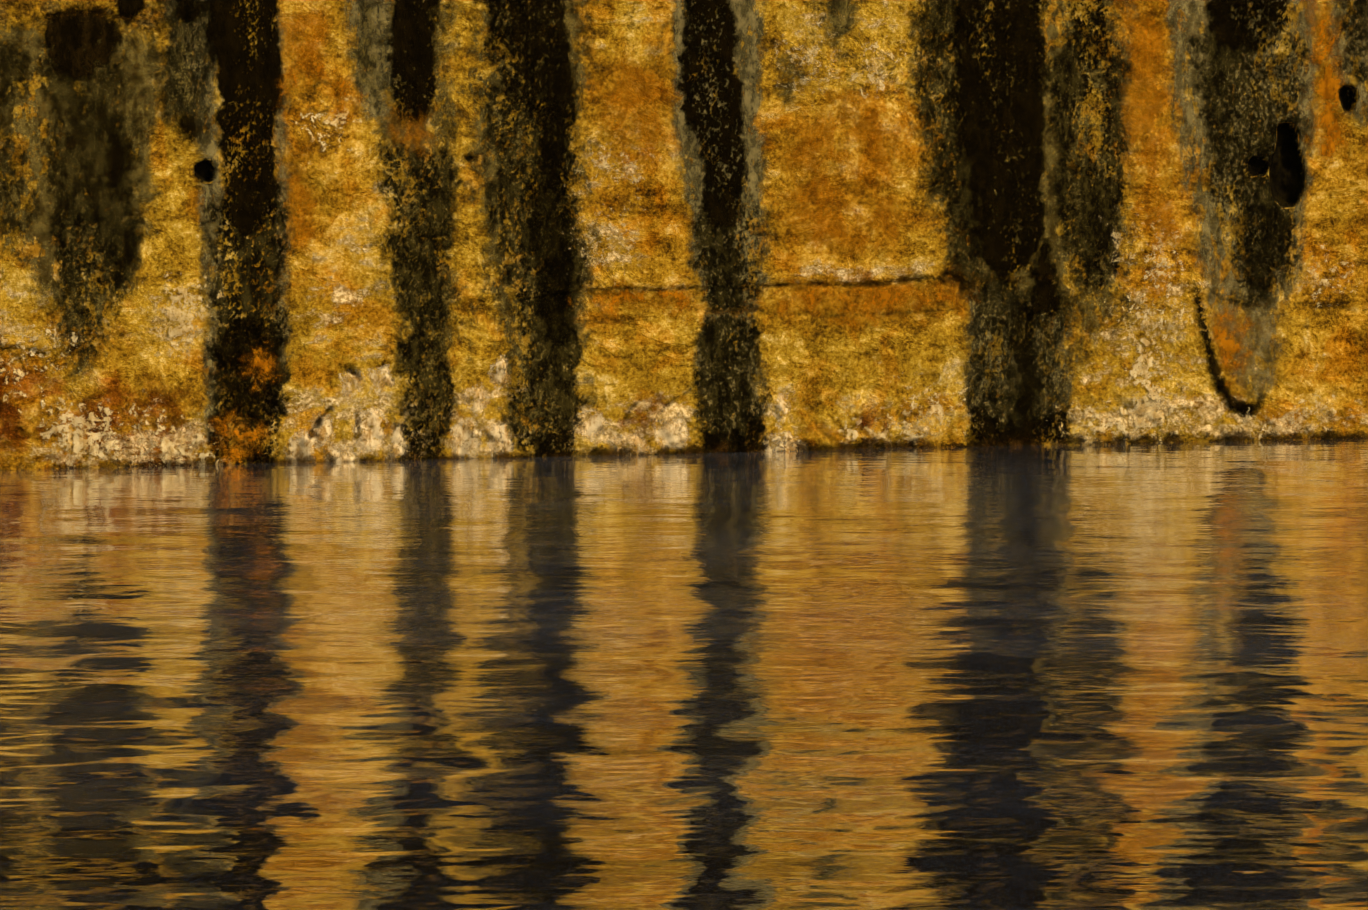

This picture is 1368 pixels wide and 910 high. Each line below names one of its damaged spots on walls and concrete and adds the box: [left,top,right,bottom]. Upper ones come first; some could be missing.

rust [0,355,40,449]
damp [0,0,1368,469]